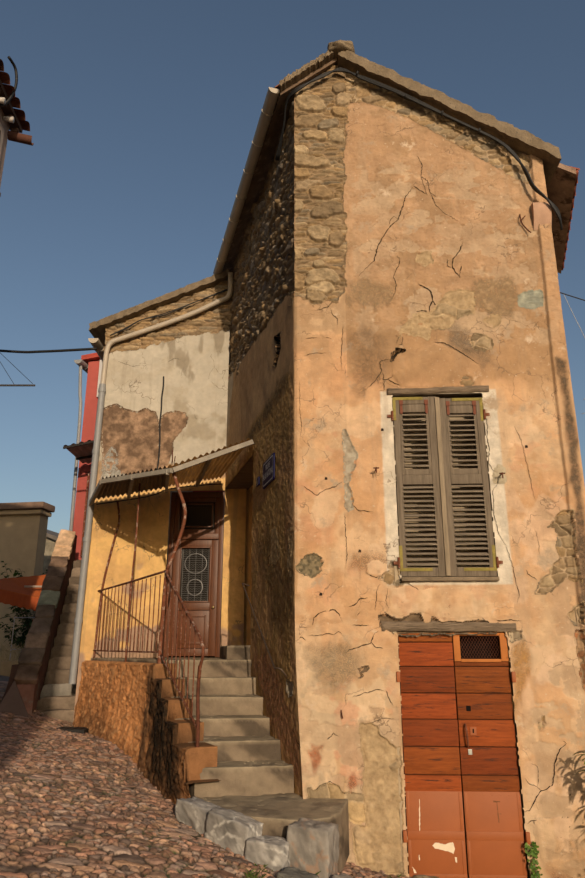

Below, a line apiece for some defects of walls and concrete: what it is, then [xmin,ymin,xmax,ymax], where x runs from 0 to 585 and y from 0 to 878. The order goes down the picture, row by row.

crack [360,163,458,301]
peeling [417,289,476,330]
peeling [469,333,494,352]
peeling [101,404,188,476]
peeling [342,429,358,512]
peeling [295,553,325,578]
peeling [535,509,583,595]
peeling [566,601,585,689]
crack [522,742,571,822]